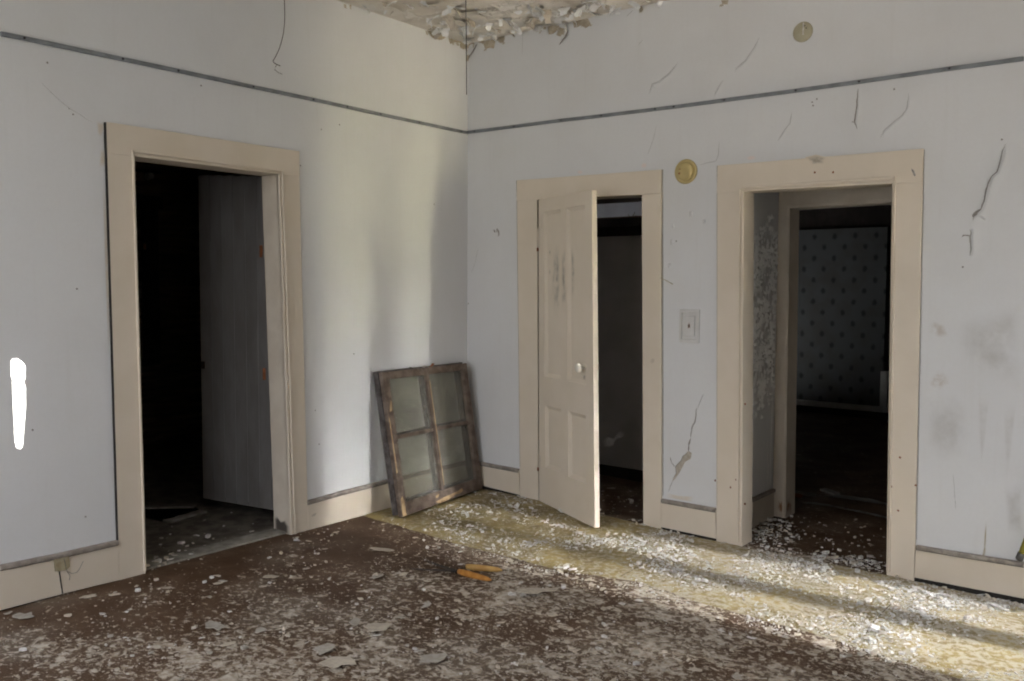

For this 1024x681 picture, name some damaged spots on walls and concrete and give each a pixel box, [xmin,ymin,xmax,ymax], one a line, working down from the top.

peeling [344,0,663,61]
crack [852,88,863,129]
crack [962,144,1017,257]
crack [668,394,706,492]